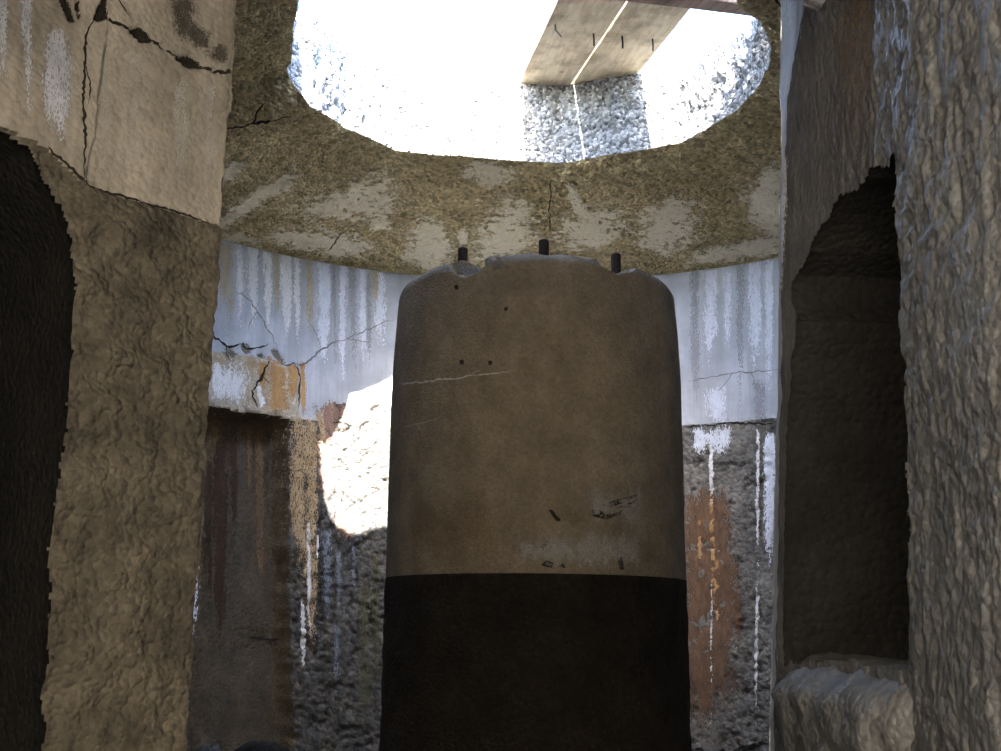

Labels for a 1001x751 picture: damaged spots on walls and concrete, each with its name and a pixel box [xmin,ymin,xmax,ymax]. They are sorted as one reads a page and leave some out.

crack [48,0,219,226]
crack [205,66,231,74]
damp [562,173,596,231]
damp [209,355,266,408]
spalling [226,342,286,364]
damp [216,242,388,385]
crack [214,291,393,427]
damp [688,143,789,571]
corrosion [197,353,357,664]
corrosion [335,513,363,539]
damp [300,523,381,743]
corrosion [684,480,751,751]